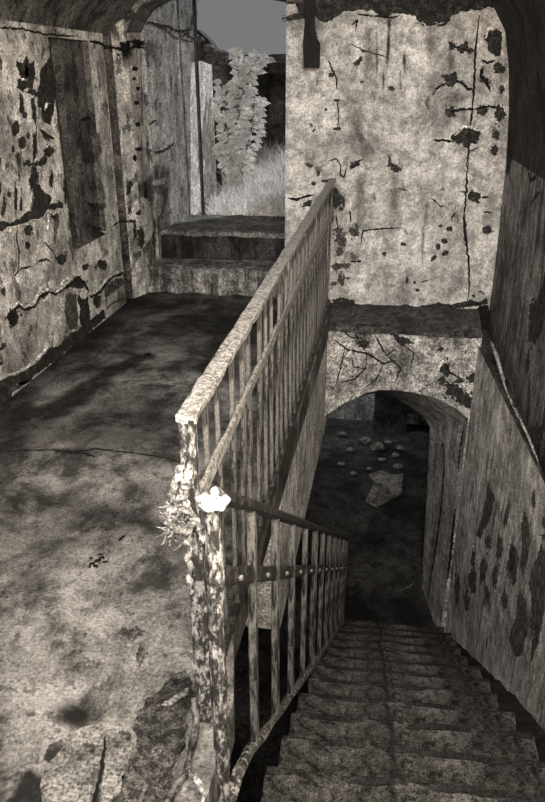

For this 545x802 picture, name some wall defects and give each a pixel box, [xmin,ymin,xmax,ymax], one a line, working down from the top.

spalling [281,0,305,22]
spalling [315,0,494,27]
peeling [0,56,70,235]
crack [463,15,480,301]
peeling [433,24,513,180]
spalling [0,277,125,406]
crack [334,332,414,389]
peeling [355,323,414,349]
peeling [437,346,475,409]
flaking render [491,341,541,461]
peeling [451,482,545,666]
crack [91,736,107,802]